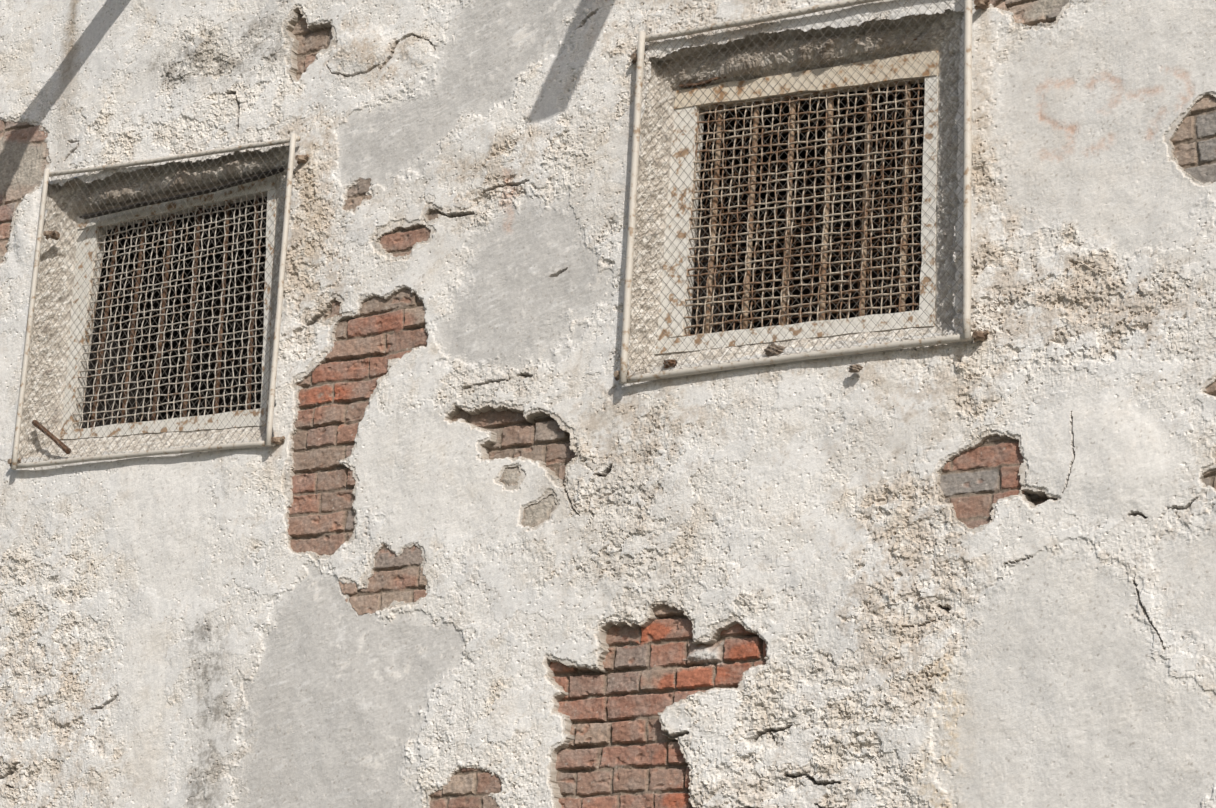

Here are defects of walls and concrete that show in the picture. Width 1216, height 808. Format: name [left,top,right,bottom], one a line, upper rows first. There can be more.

spalling [285,7,333,82]
peeling [989,0,1216,262]
spalling [0,118,50,264]
spalling [1203,378,1216,397]
peeling [225,186,618,808]
spalling [936,432,1060,529]
crack [1061,411,1075,494]
crack [1127,496,1198,519]
spalling [1199,449,1216,491]
crack [1131,577,1166,651]
spalling [545,602,768,808]